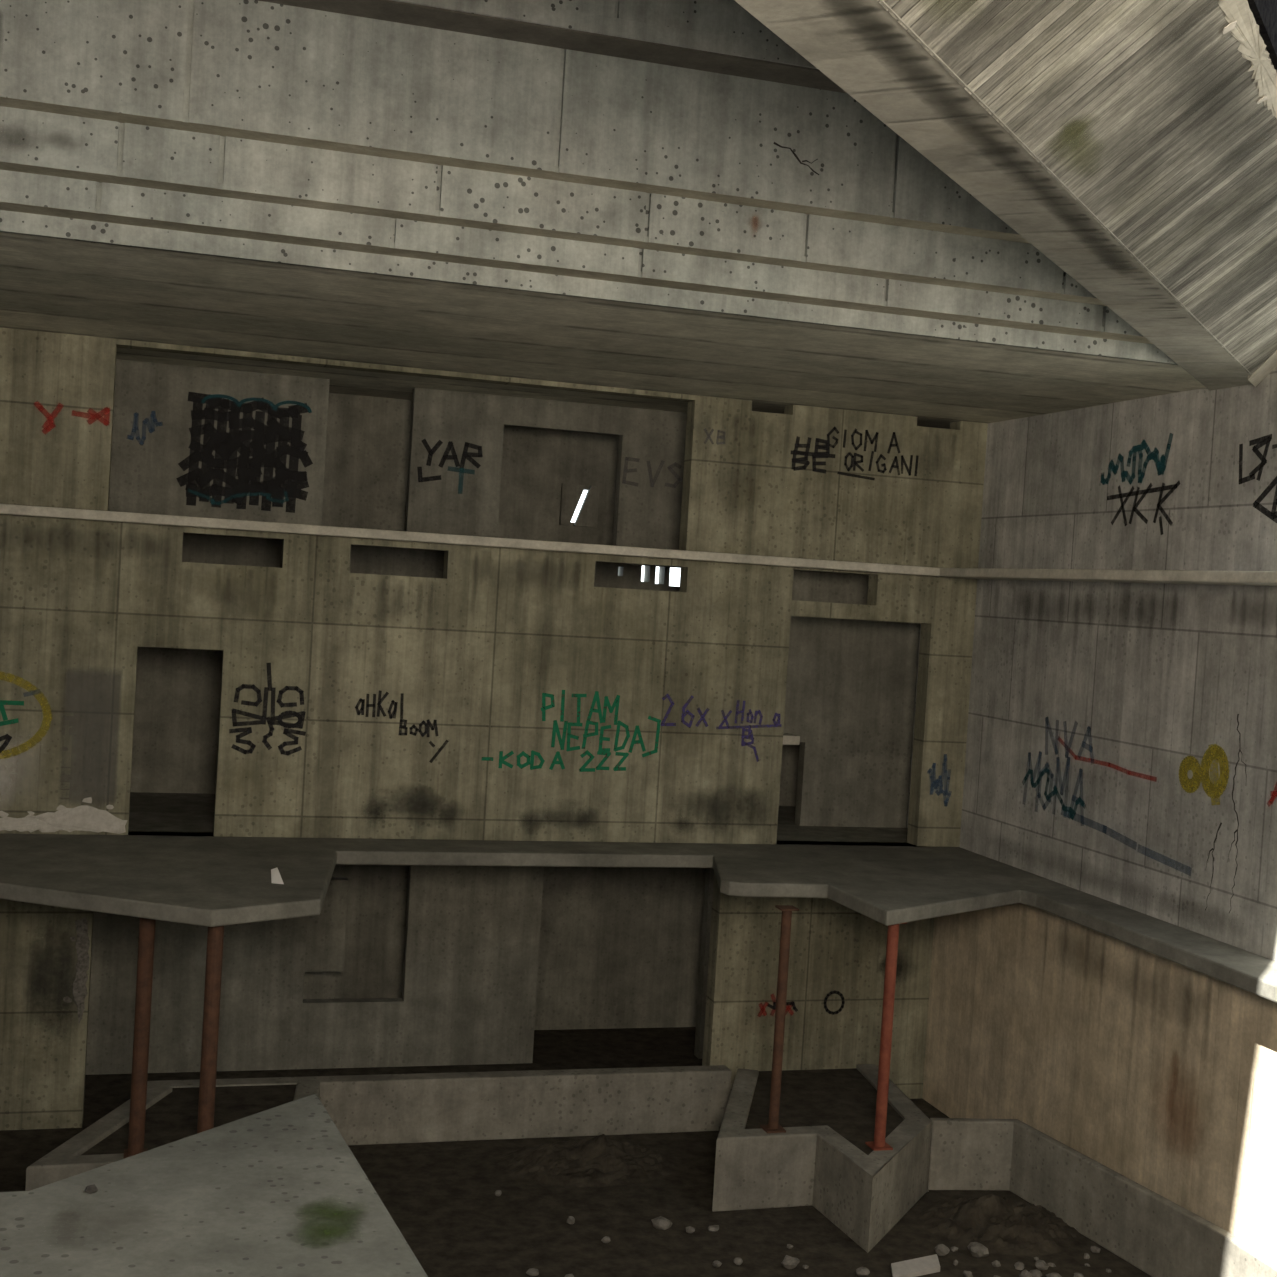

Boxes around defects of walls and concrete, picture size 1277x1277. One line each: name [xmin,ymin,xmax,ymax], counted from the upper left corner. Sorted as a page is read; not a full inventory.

peeling [0,797,127,834]